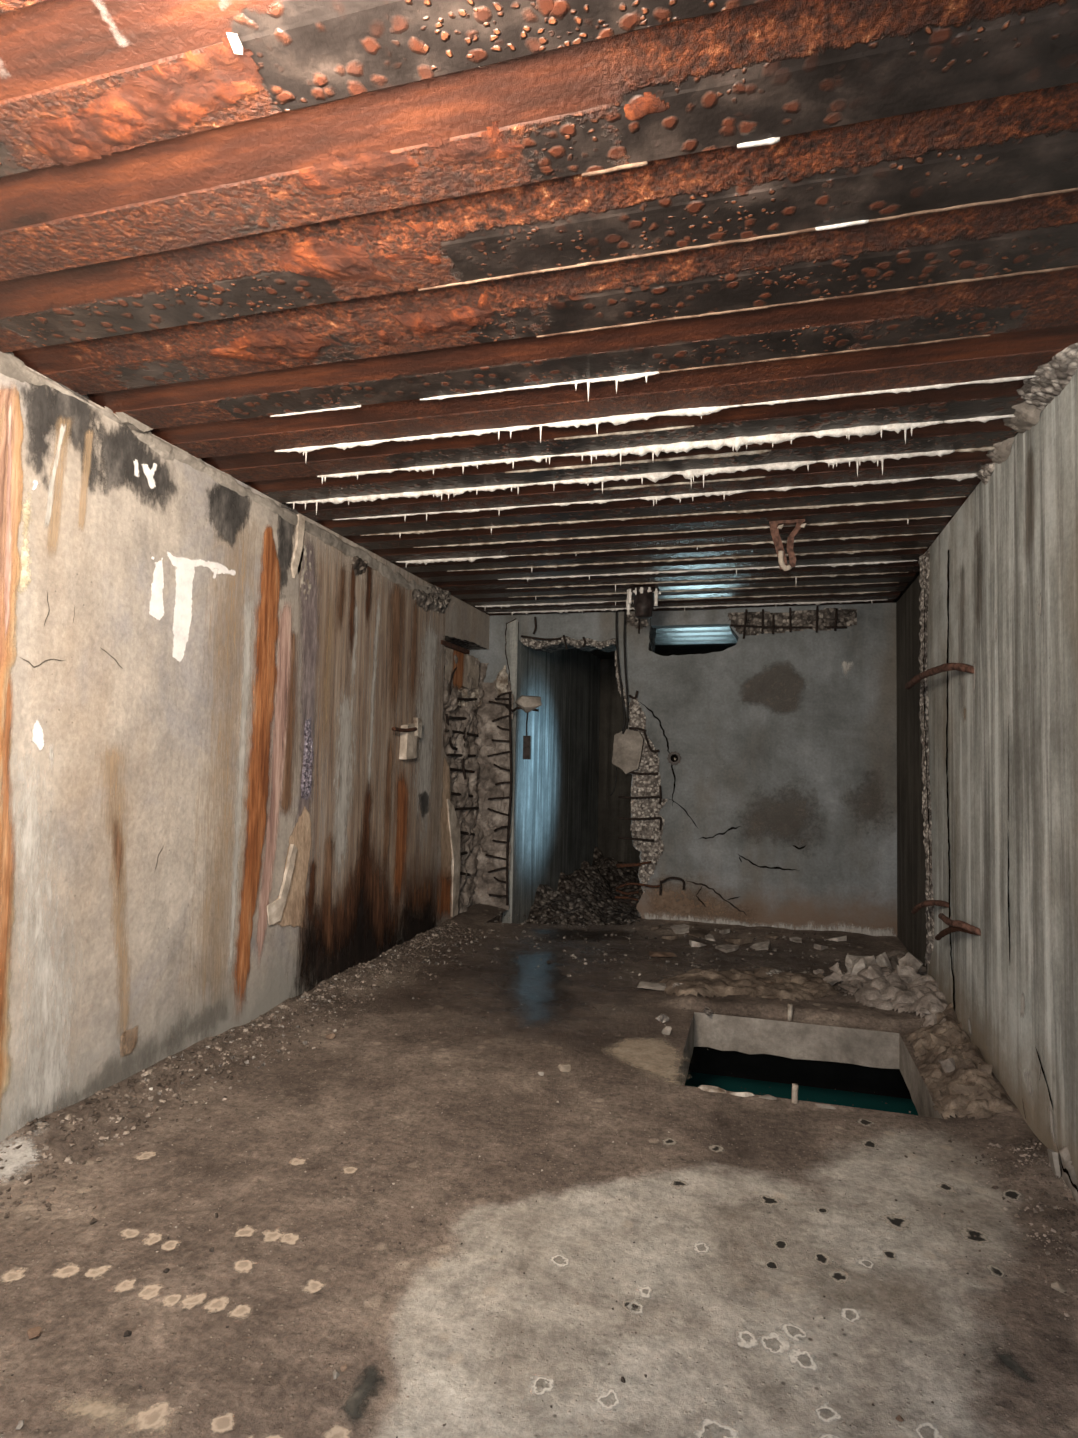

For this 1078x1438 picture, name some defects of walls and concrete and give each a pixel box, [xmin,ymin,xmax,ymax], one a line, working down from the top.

rust [29,32,264,166]
rust [278,221,441,283]
leakage [22,378,176,548]
leakage [209,485,250,545]
leakage [277,504,319,823]
rust [0,388,31,1112]
leakage [295,605,438,996]
spalling [436,654,489,925]
spalling [615,651,685,907]
crack [640,702,805,871]
crack [687,881,746,915]
spalling [688,1047,912,1099]